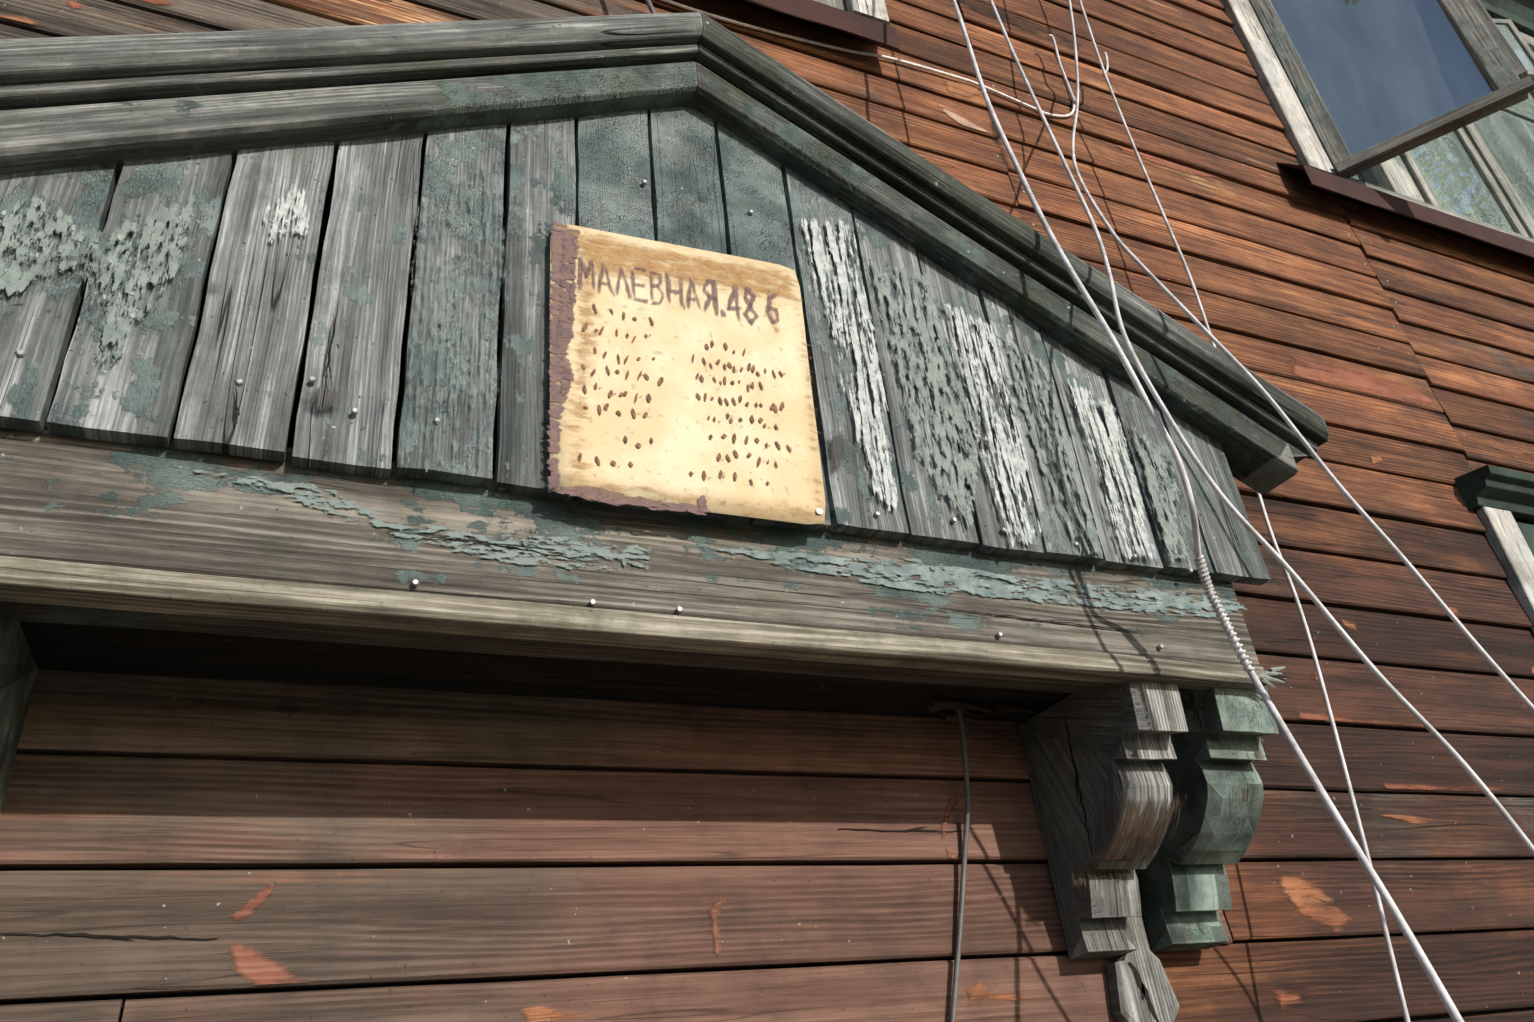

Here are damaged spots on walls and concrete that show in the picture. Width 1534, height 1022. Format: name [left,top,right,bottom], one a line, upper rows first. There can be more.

peeling [0,16,36,24]
peeling [263,188,310,244]
peeling [0,193,200,366]
peeling [801,216,1186,565]
peeling [192,469,652,573]
peeling [700,544,1247,618]
crack [1064,715,1093,854]